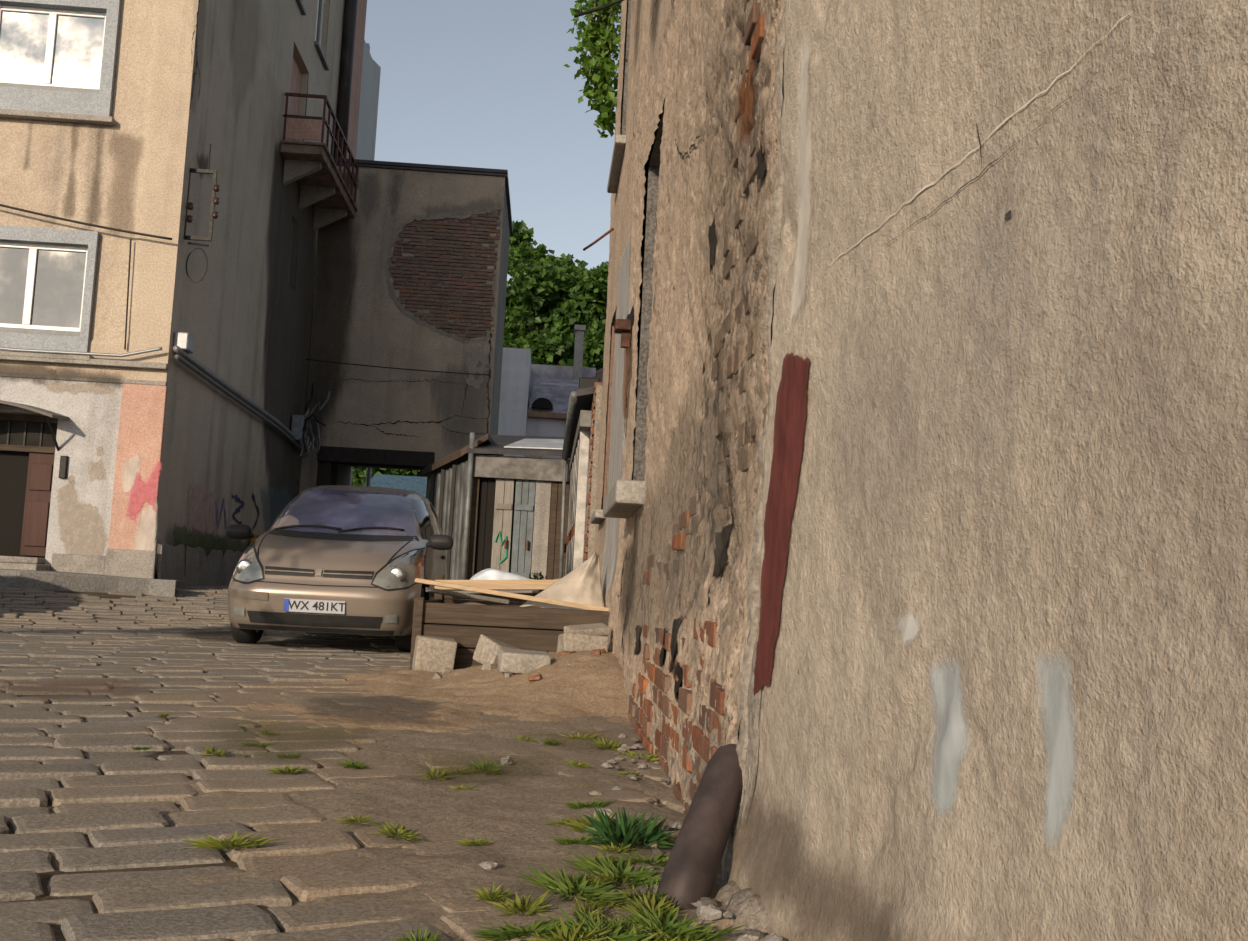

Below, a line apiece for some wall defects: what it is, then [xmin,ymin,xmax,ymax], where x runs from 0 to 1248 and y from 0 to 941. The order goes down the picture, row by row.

spalling [384,207,503,389]
crack [338,333,492,437]
spalling [628,0,784,830]
peeling [124,456,139,492]
peeling [135,504,156,551]